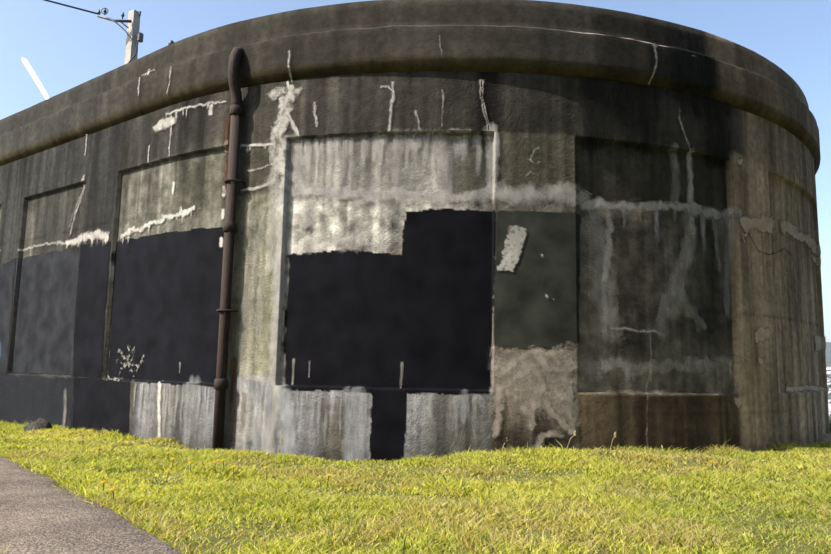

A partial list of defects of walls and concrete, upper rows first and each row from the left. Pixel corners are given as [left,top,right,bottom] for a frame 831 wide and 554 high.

water stain [153,101,226,131]
water stain [368,125,742,242]
water stain [60,230,108,245]
water stain [121,206,195,238]
water stain [240,81,354,455]